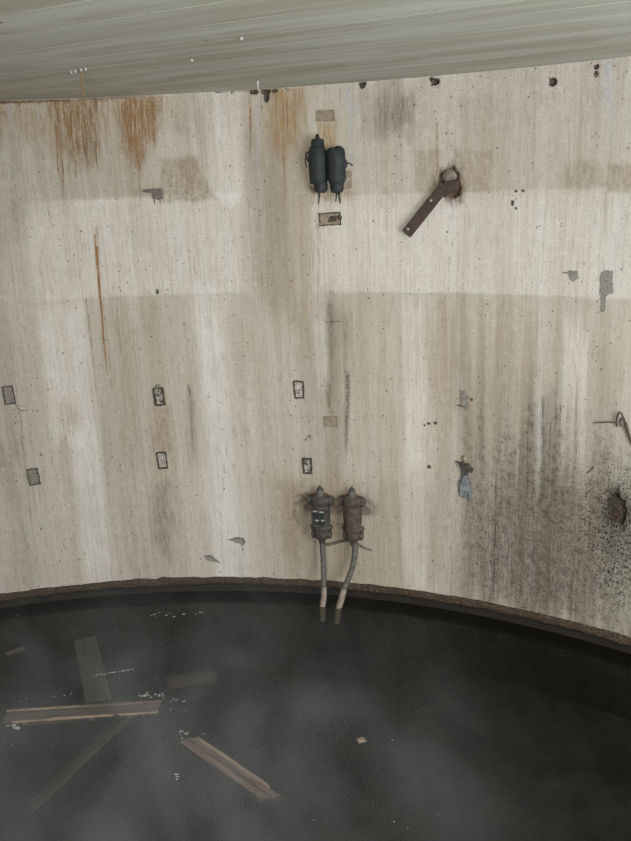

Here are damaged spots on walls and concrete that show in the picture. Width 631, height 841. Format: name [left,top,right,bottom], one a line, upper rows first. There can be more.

rust [36,99,97,187]
rust [121,97,156,167]
rust [94,235,106,360]
mould [583,479,631,593]